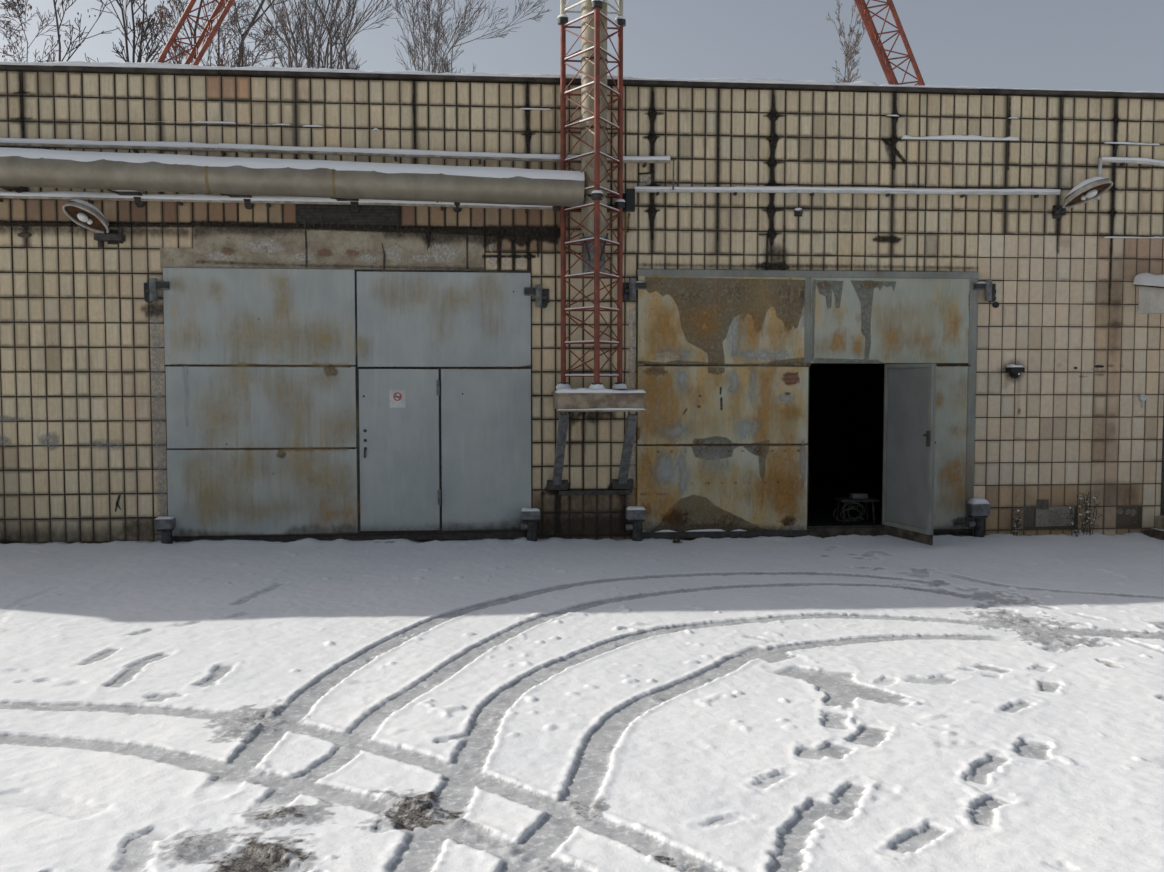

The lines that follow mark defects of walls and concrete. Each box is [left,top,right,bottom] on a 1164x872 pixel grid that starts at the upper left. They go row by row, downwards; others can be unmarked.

damp [14,71,31,137]
damp [521,82,535,154]
damp [882,92,907,170]
damp [0,220,88,233]
damp [108,221,561,271]
damp [629,91,896,390]
rust [171,364,531,376]
rust [783,372,799,395]
rust [186,448,355,458]
rust [636,428,805,452]
damp [692,436,769,480]
damp [537,445,792,539]